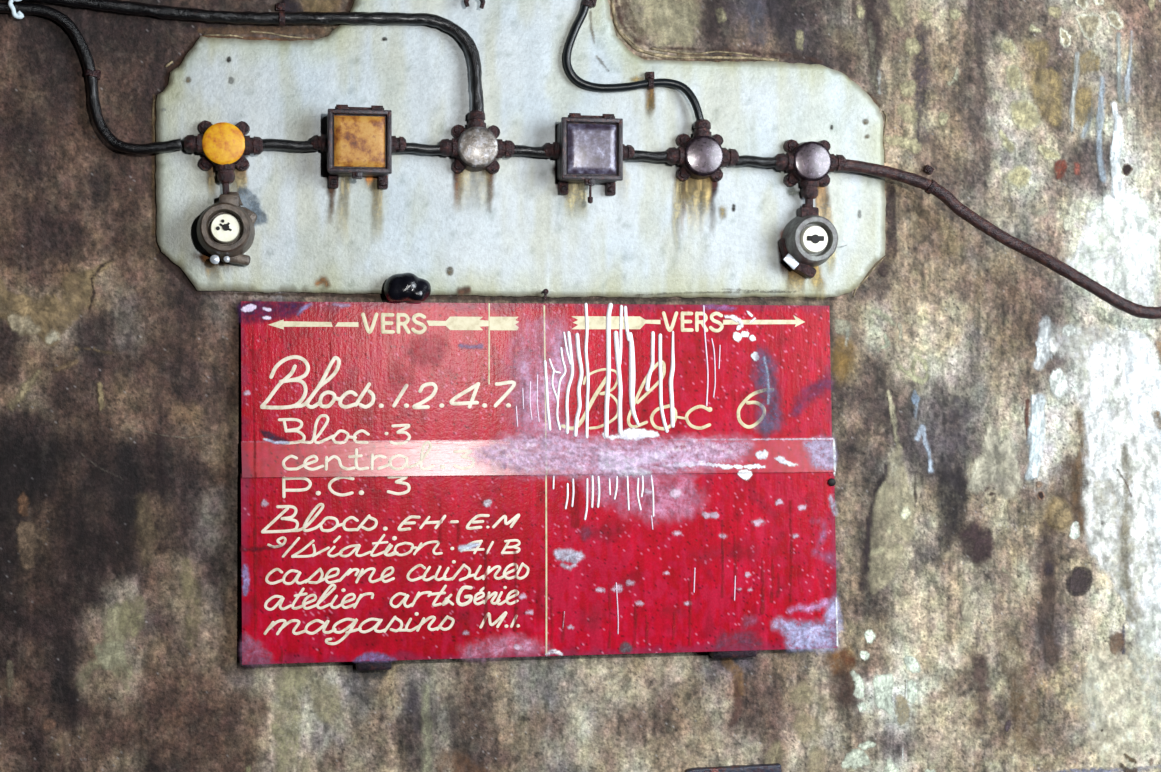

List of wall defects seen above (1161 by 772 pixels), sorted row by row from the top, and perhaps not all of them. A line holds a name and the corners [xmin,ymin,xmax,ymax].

rust [231,167,247,190]
rust [323,160,351,213]
rust [366,175,388,215]
rust [451,157,494,201]
rust [552,163,586,204]
rust [674,165,725,219]
rust [816,186,832,223]
efflorescence [1063,33,1159,306]
rust [199,253,228,274]
rust [778,232,834,289]
damp [947,476,994,562]
damp [1026,317,1161,759]